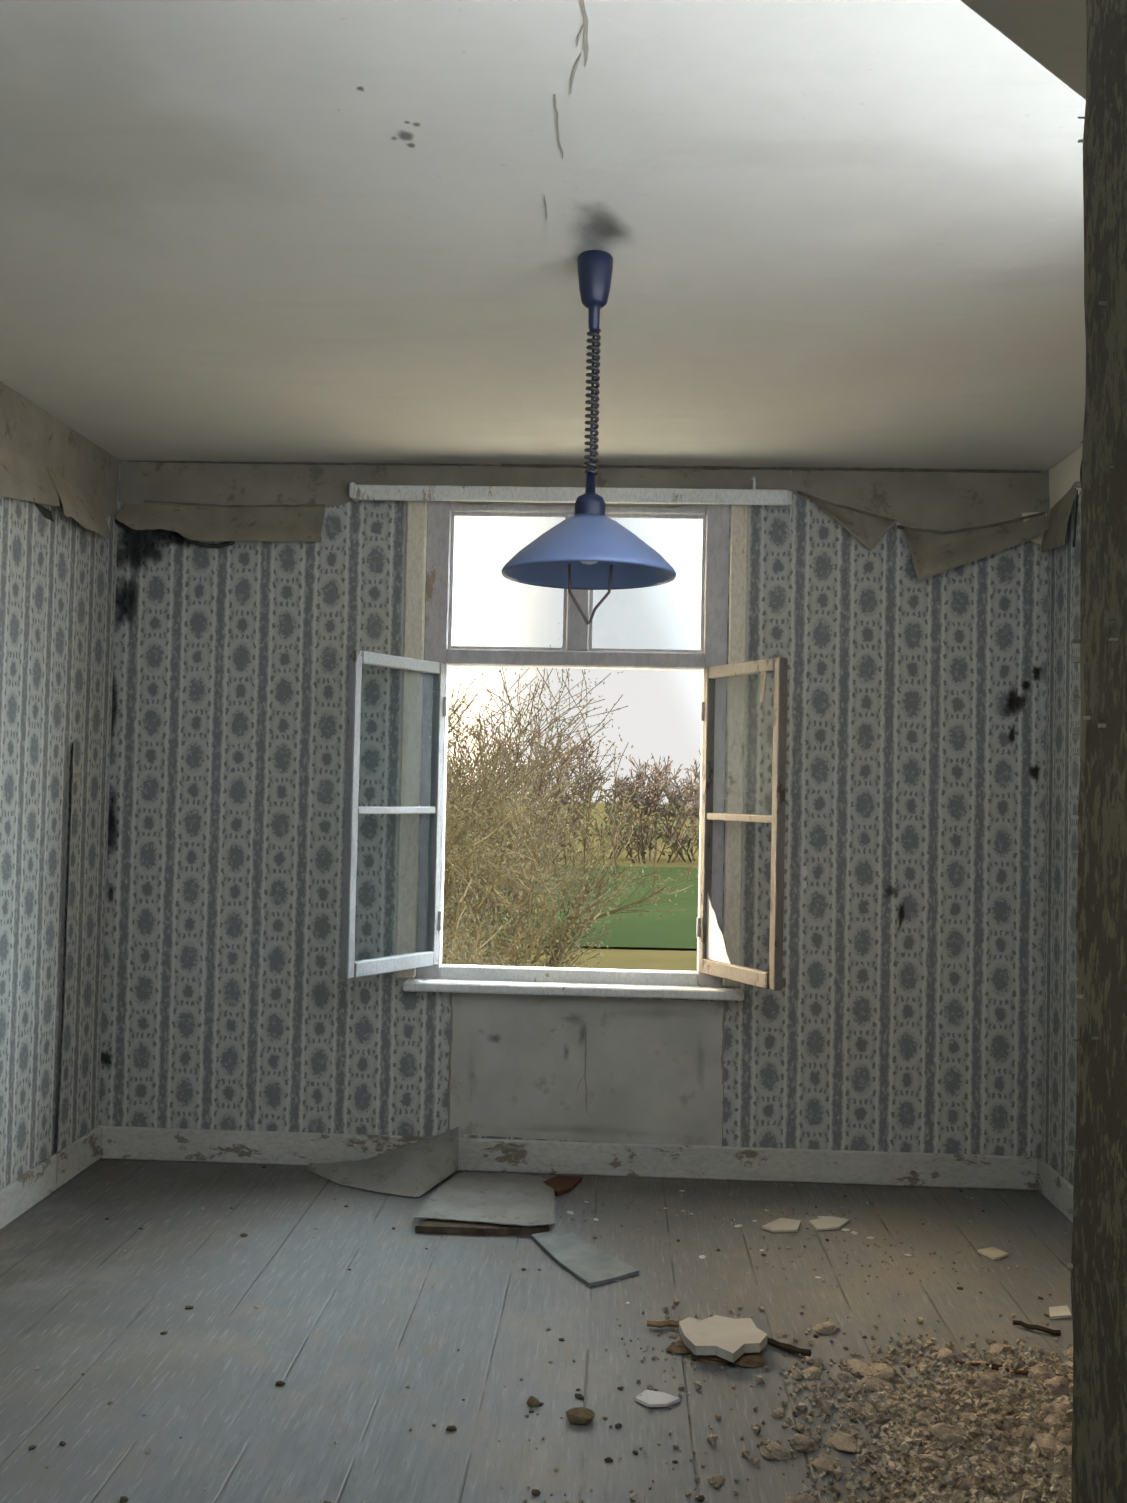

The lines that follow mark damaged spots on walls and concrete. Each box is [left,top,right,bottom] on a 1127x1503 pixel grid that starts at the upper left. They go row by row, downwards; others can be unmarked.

crack [554,0,589,159]
flaking render [353,446,1083,532]
water stain [115,529,189,622]
water stain [108,792,117,850]